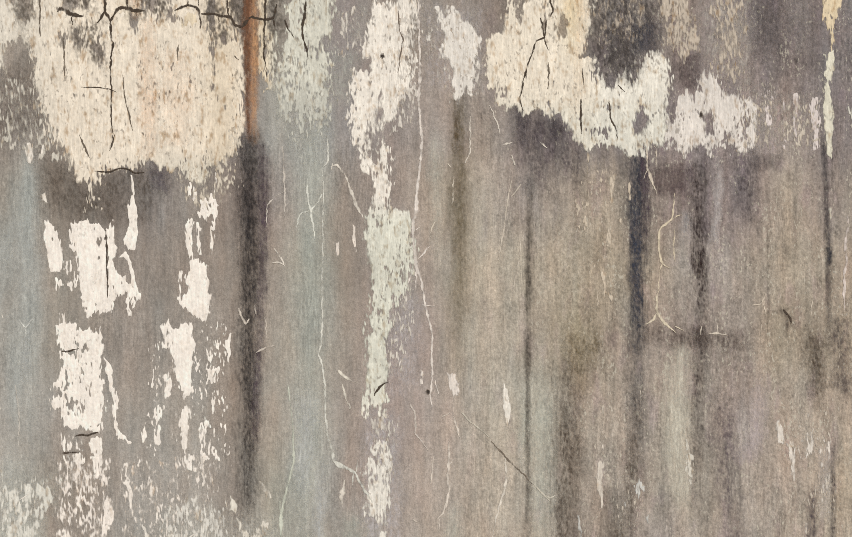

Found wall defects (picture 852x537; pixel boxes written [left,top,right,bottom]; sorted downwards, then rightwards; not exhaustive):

crack [39,0,145,174]
crack [174,0,308,75]
rust [242,0,258,129]
peeling [0,0,271,537]
water stain [240,136,267,407]
crack [398,0,555,537]
peeling [256,0,842,537]